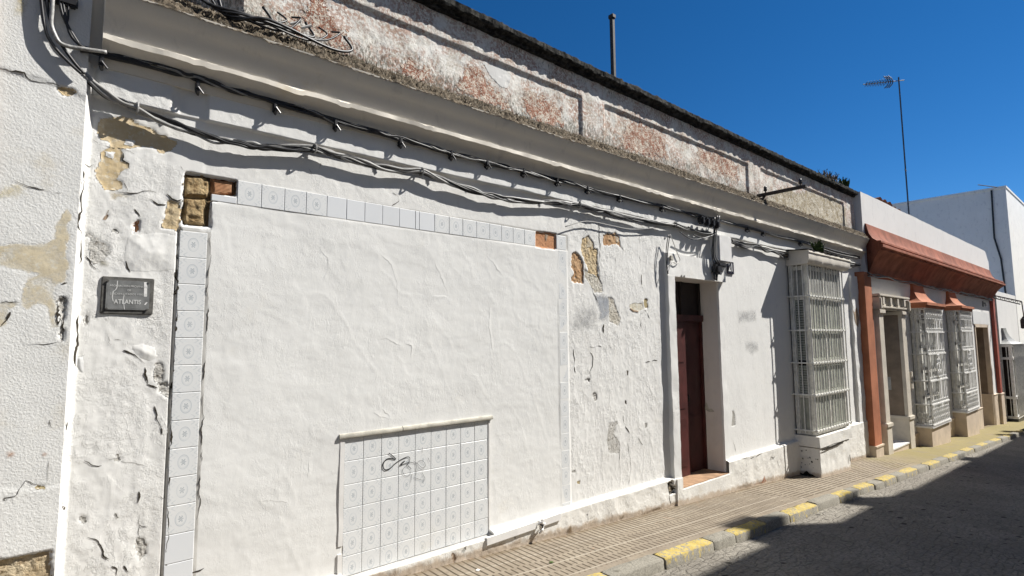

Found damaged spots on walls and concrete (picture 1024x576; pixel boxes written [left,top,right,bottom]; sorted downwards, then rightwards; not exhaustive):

crack [0,59,60,86]
spalling [58,87,76,96]
peeling [95,116,177,196]
peeling [162,172,237,231]
crack [0,141,183,367]
spalling [571,232,648,326]
spalling [154,362,172,399]
spalling [607,422,620,454]
crack [4,463,49,503]
spalling [0,551,53,576]